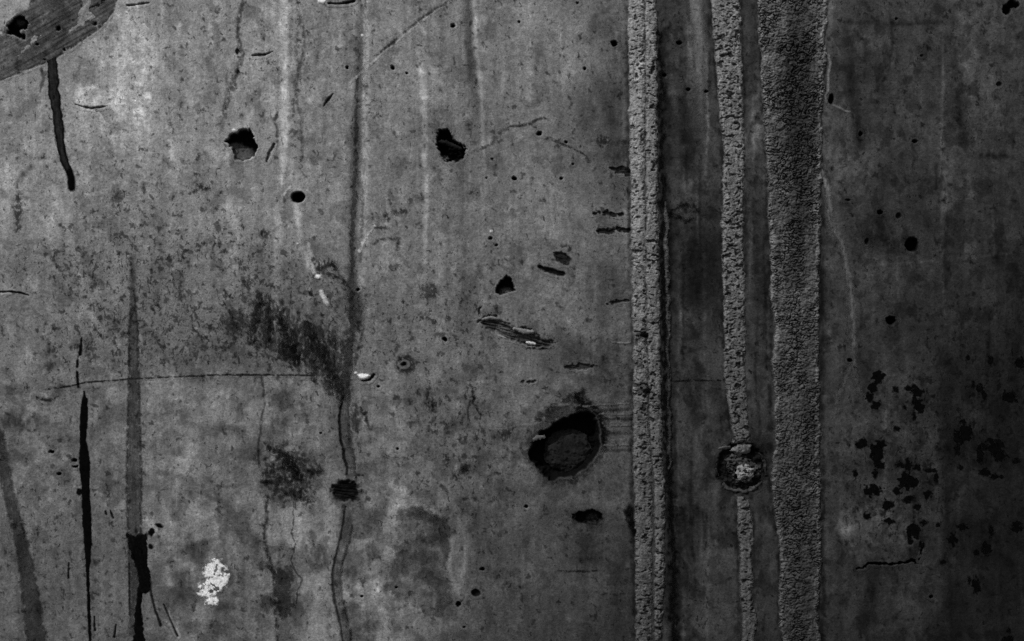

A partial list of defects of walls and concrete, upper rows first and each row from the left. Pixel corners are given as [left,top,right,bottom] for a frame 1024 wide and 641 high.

spalling [3,12,31,40]
spalling [214,114,278,166]
spalling [433,126,470,166]
spalling [472,273,562,351]
crack [36,374,315,463]
peeling [865,370,925,421]
crack [328,290,369,641]
peeling [852,426,940,547]
peeling [953,419,1021,480]
spalling [570,505,606,528]
crack [853,544,927,572]